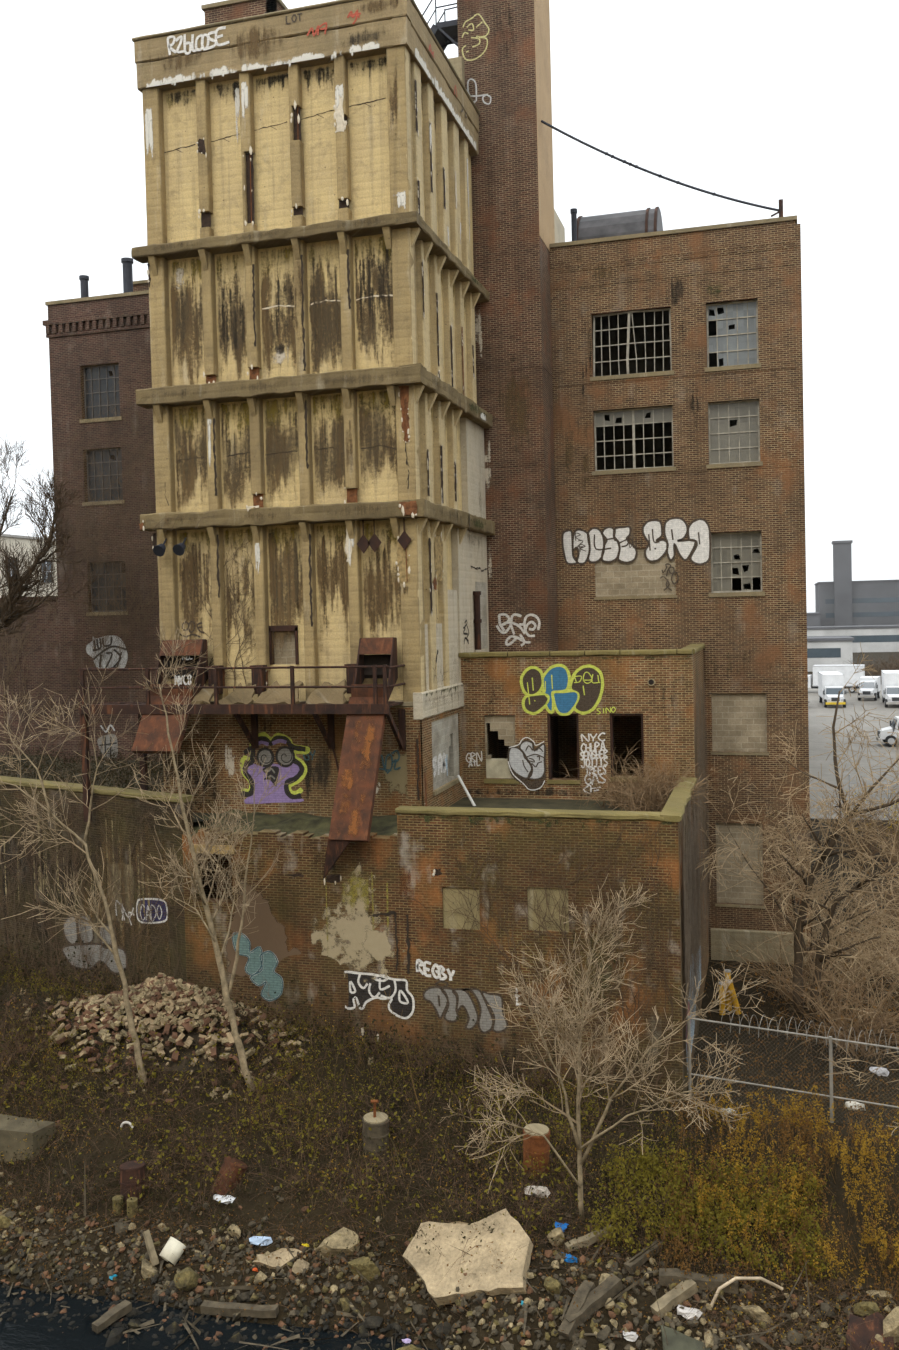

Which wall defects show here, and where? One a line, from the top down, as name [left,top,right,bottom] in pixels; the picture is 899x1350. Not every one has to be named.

leakage [146,26,397,143]
leakage [219,277,245,359]
leakage [271,259,342,368]
leakage [356,249,393,349]
leakage [175,412,251,492]
leakage [266,414,299,475]
leakage [318,408,392,479]
leakage [179,539,210,640]
leakage [226,533,401,654]
rust [339,718,375,837]